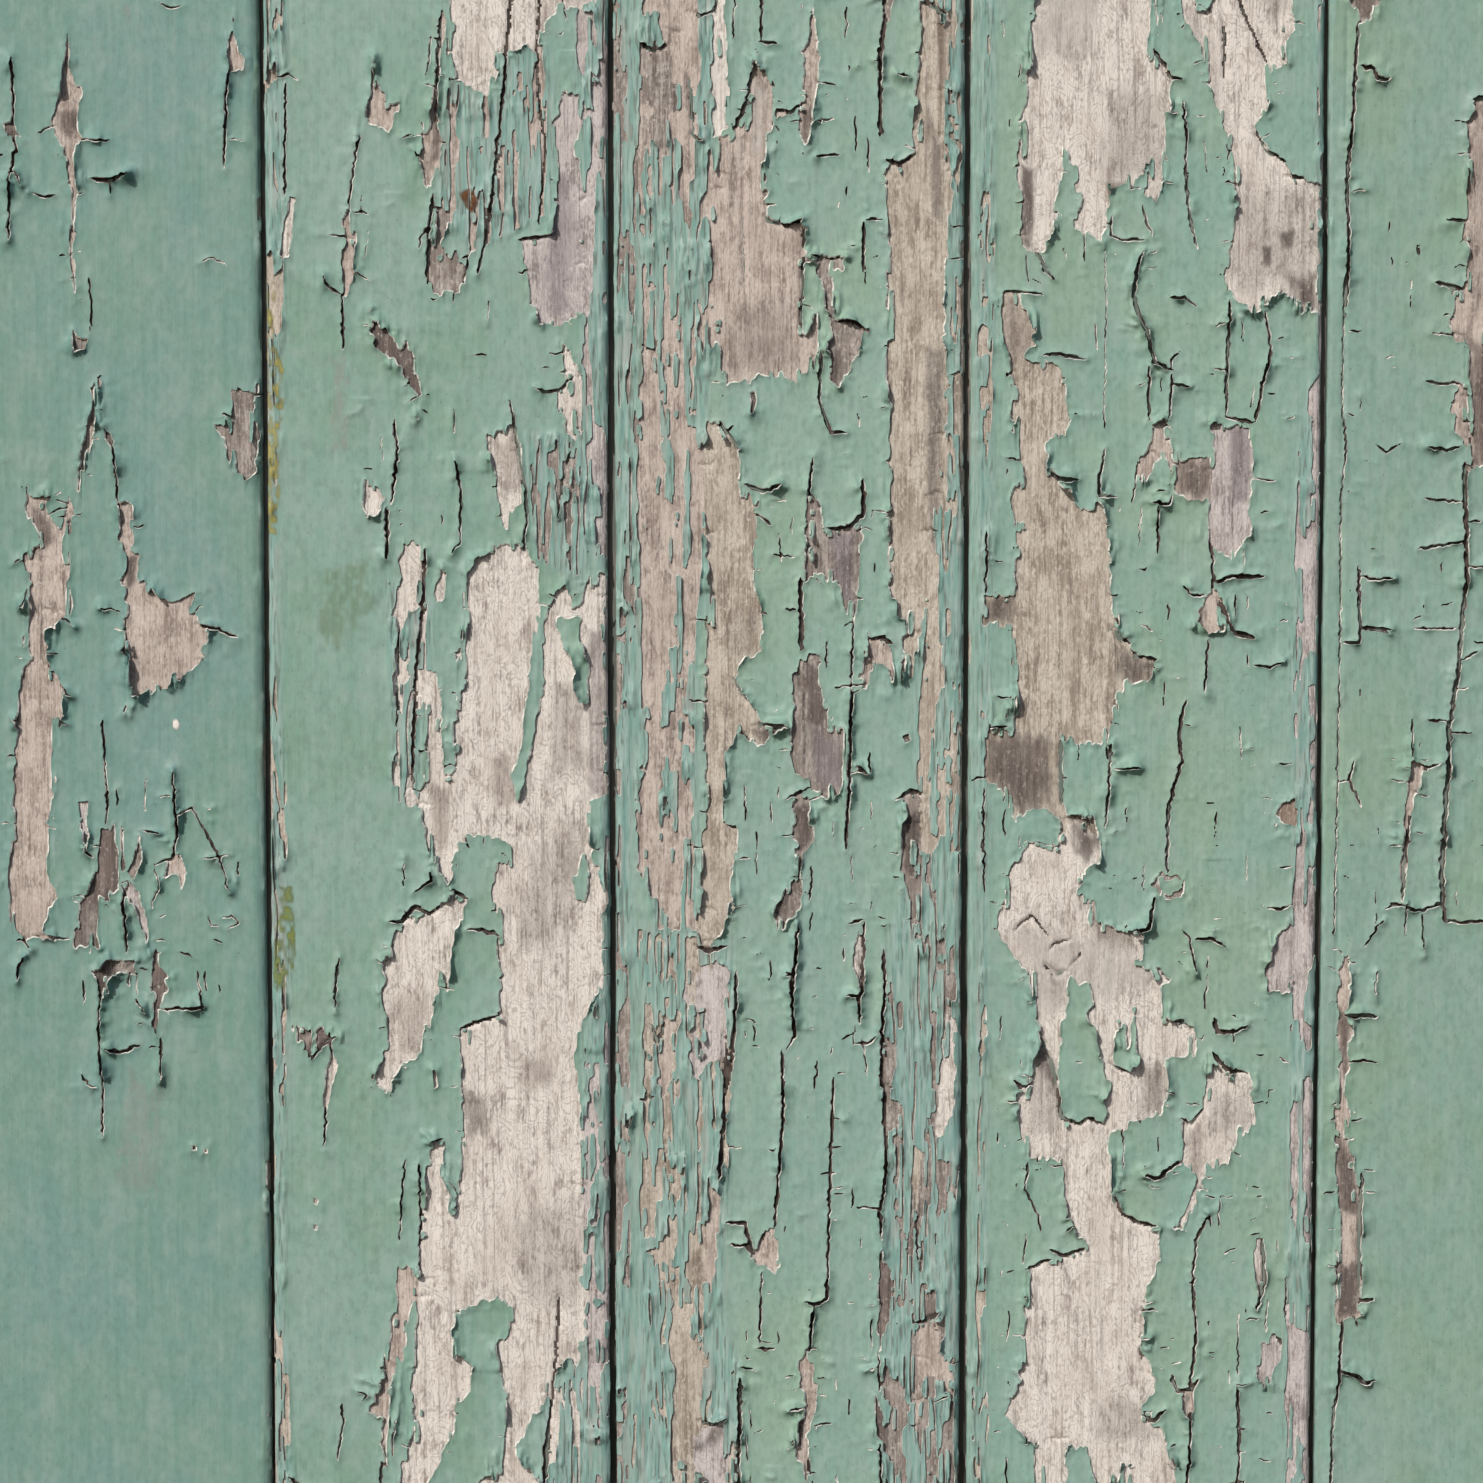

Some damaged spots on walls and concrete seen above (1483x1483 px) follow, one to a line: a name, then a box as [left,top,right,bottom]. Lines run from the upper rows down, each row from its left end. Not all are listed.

crack [0,52,27,244]
crack [85,169,132,200]
crack [1389,222,1420,307]
peeling [0,26,237,1133]
peeling [1385,92,1483,950]
crack [97,714,239,917]
peeling [324,0,1390,1483]
crack [197,939,239,1011]